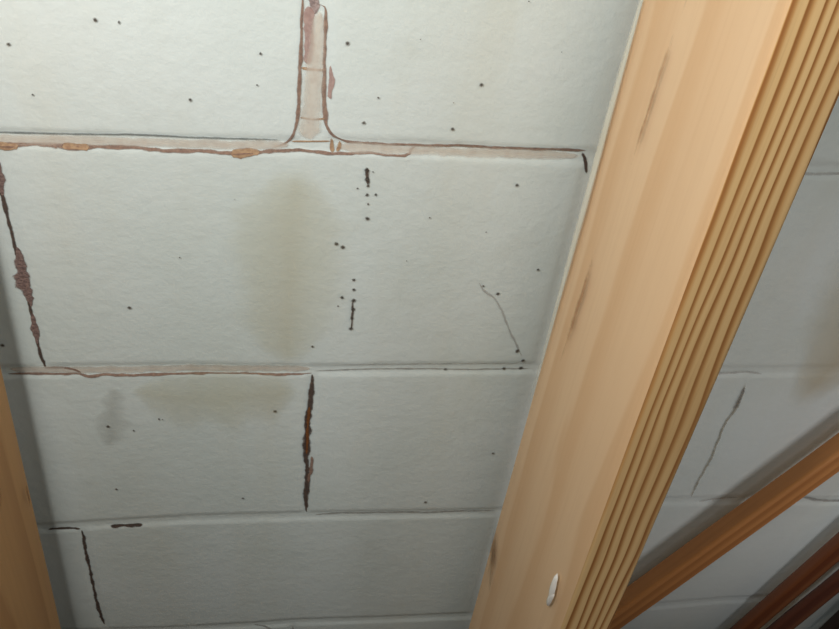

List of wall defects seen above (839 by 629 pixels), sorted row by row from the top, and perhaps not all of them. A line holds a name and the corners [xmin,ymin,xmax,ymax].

crack [0,0,587,512]
crack [692,388,745,495]
crack [49,527,105,624]